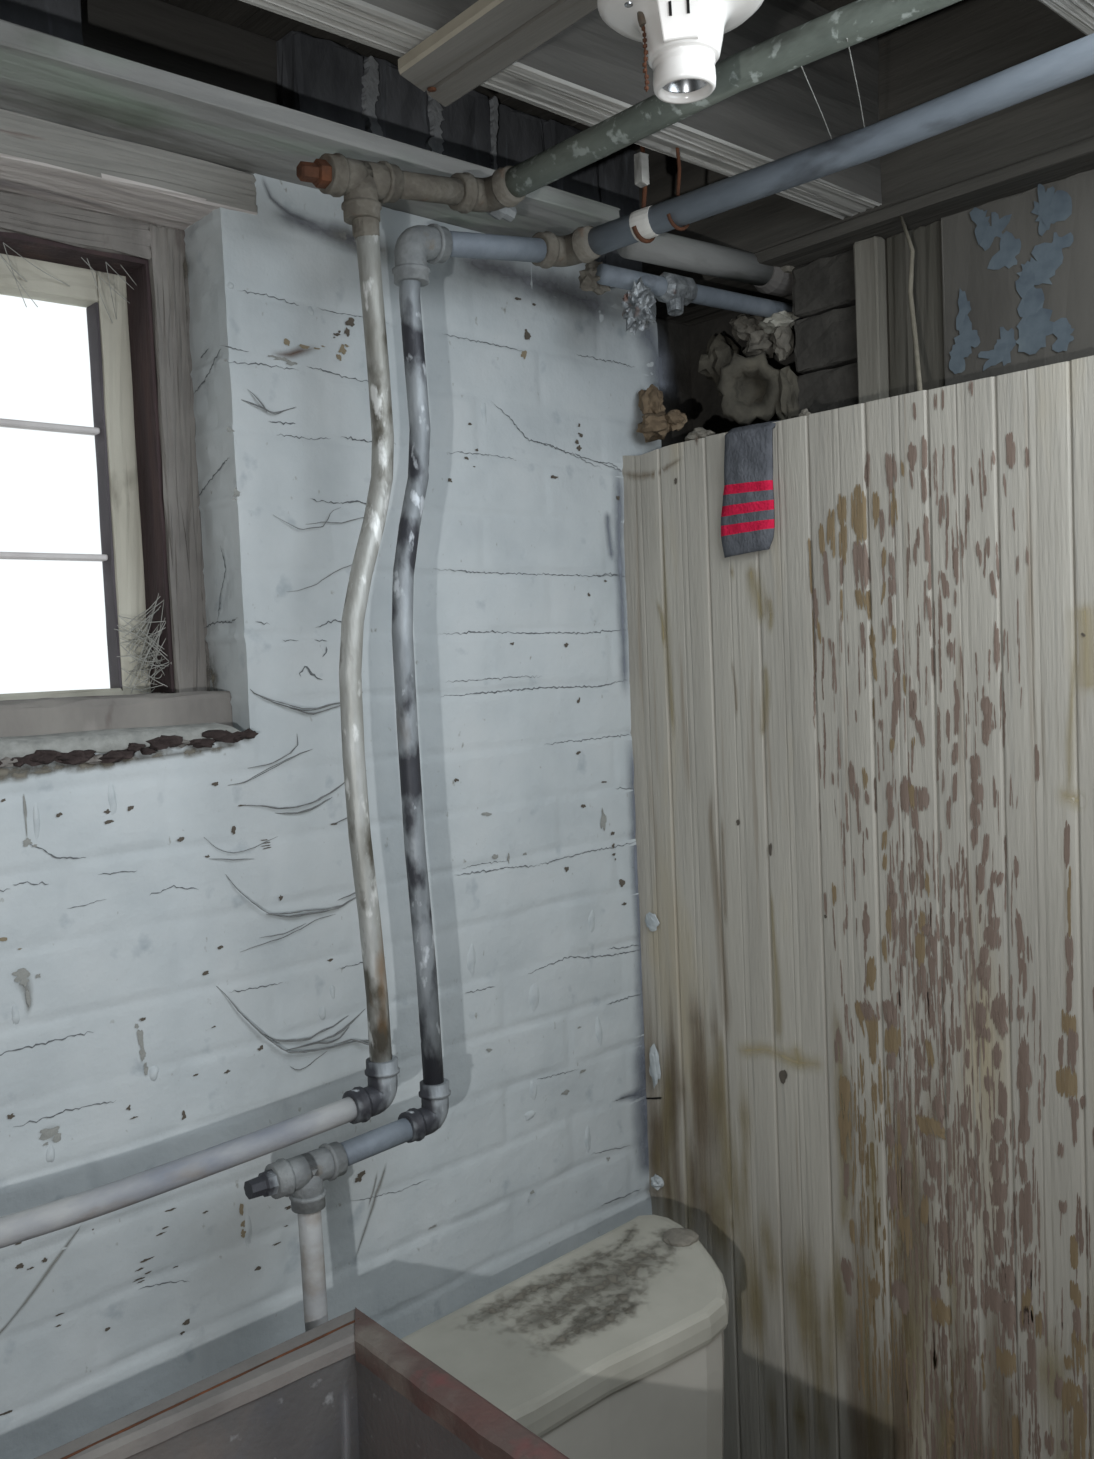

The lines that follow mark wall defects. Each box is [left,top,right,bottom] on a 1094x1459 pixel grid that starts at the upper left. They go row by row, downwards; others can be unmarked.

peeling [949,184,1074,395]
spalling [0,729,259,768]
peeling [808,402,1094,1459]